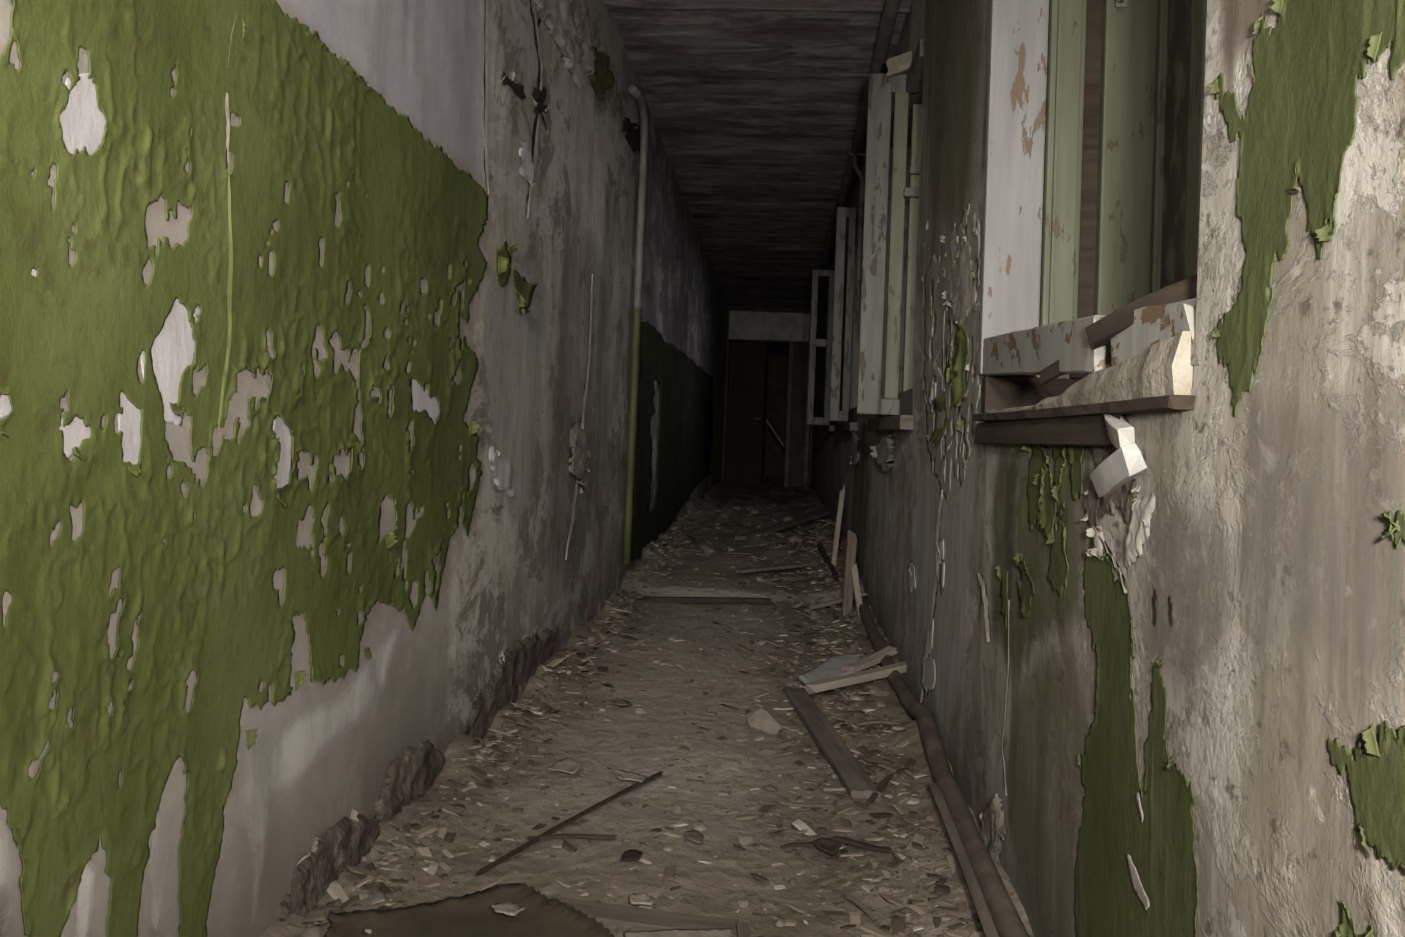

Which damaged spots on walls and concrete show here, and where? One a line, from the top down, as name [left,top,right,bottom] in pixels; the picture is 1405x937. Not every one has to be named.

peeling [1207,0,1405,417]
peeling [917,203,981,502]
peeling [0,0,538,937]
peeling [935,539,945,588]
flaking render [464,627,559,739]
peeling [921,618,935,693]
peeling [996,445,1199,937]
peeling [1327,720,1405,874]
peeling [1335,900,1374,937]